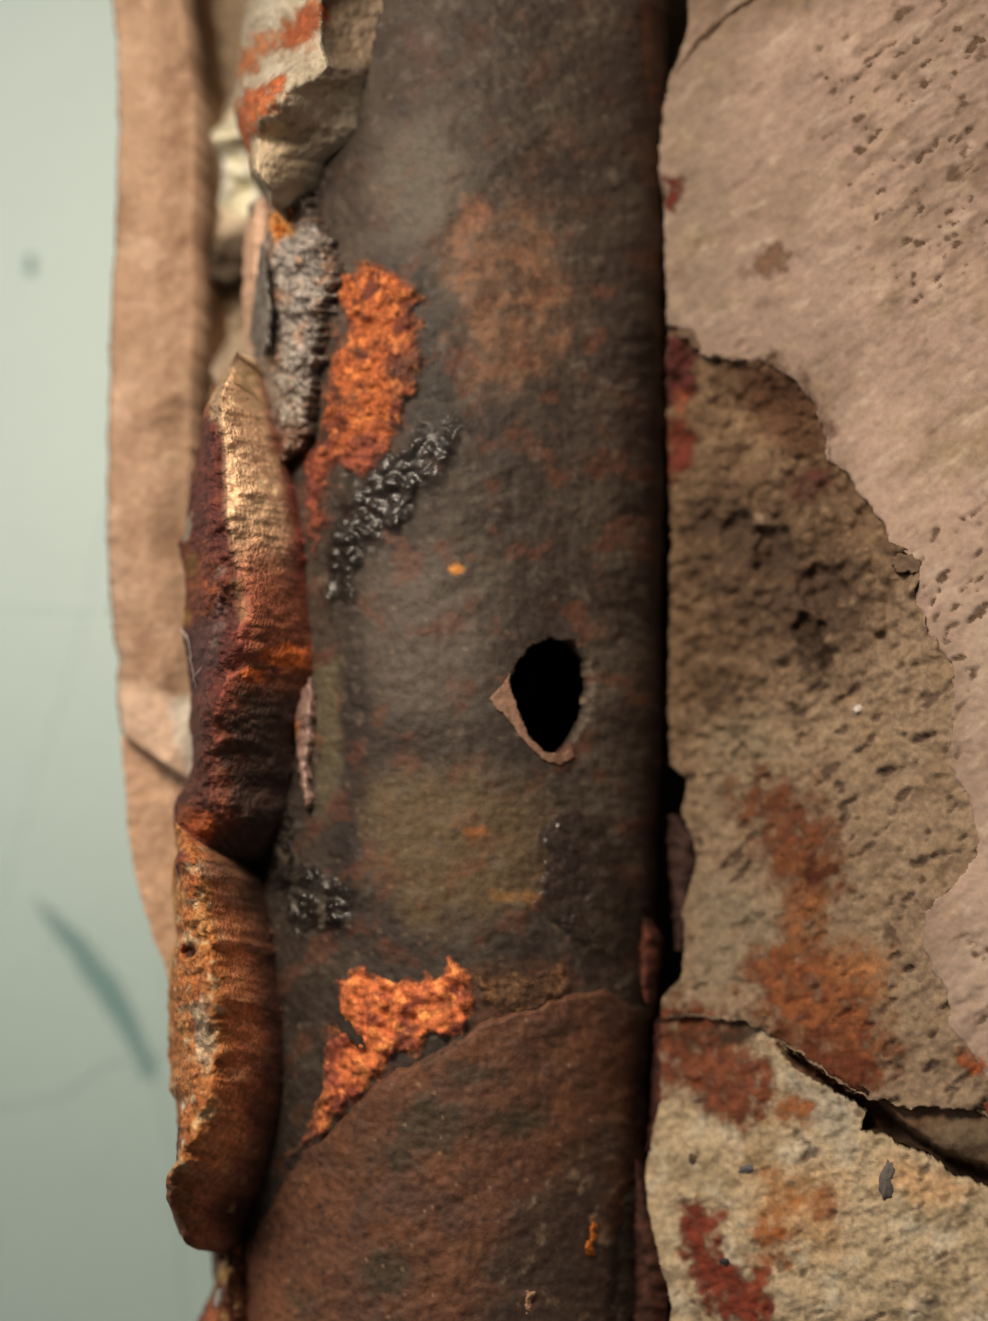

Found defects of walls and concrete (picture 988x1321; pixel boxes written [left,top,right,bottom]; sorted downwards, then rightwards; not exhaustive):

rust [235,0,330,169]
crack [675,0,754,74]
rust [166,260,903,1321]
spalling [645,326,988,1321]
crack [776,1036,870,1095]